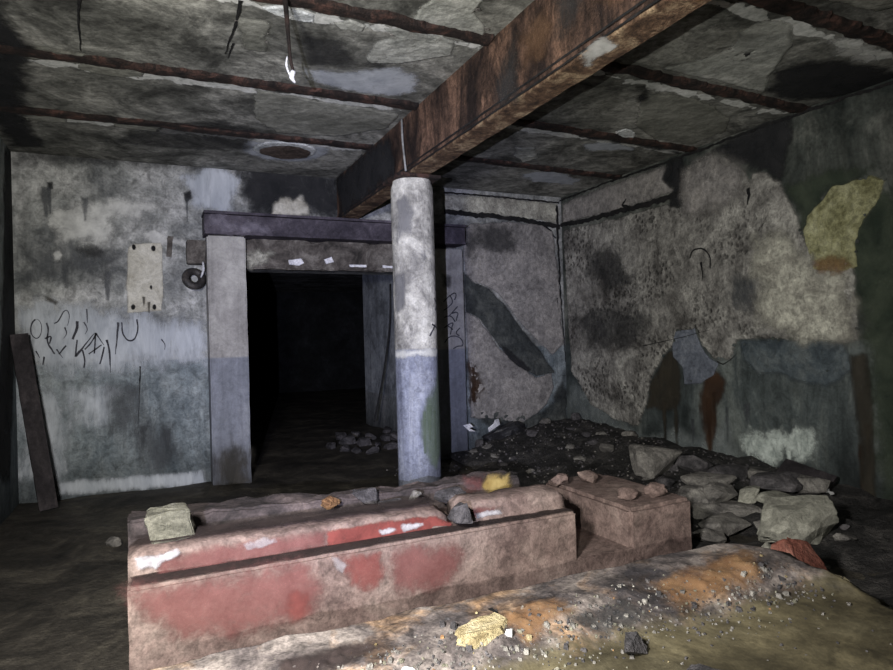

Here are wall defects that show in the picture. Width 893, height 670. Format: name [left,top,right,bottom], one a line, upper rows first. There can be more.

peeling [217,0,490,64]
corrosion [582,37,616,66]
peeling [19,47,402,151]
peeling [514,147,538,162]
damp [42,182,53,216]
peeling [272,196,308,215]
crack [444,81,893,362]
damp [24,247,110,297]
flaking render [444,154,887,429]
corrosion [466,362,484,403]
corrosion [700,372,725,450]